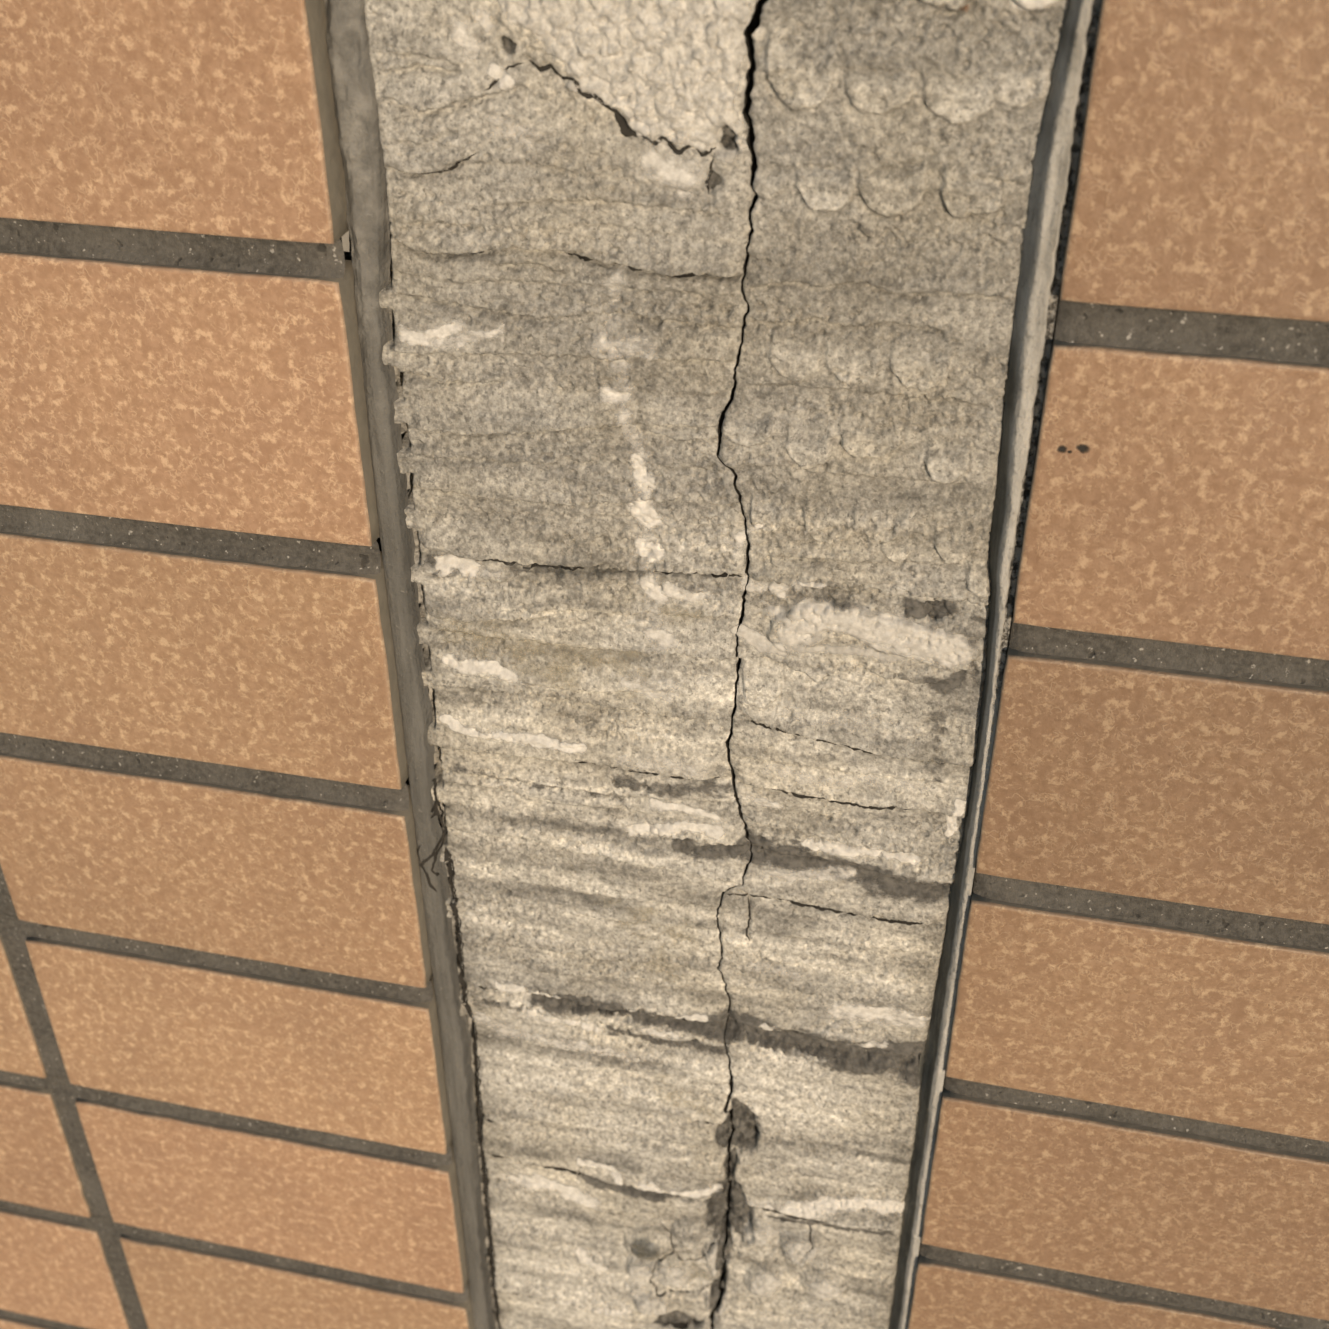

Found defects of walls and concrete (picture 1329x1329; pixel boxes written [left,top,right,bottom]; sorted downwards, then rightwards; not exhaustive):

crack [475,0,922,1329]
peeling [731,599,974,669]
spalling [654,1098,759,1325]